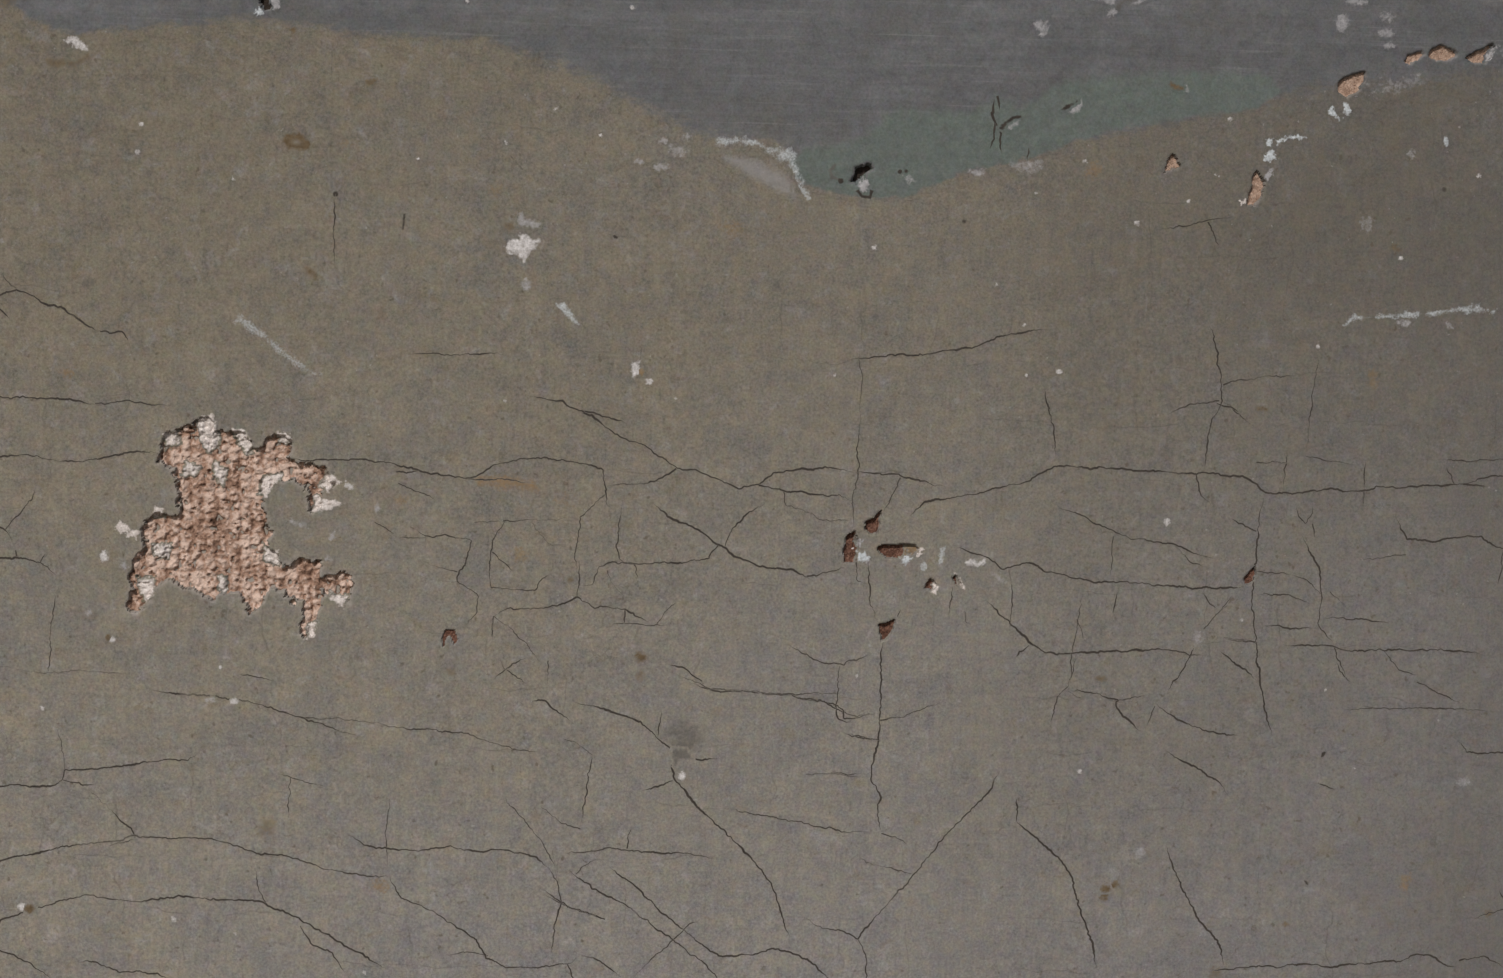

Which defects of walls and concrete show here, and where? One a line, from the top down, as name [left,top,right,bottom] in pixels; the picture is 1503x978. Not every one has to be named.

peeling [1404,44,1502,66]
peeling [1326,73,1364,123]
peeling [1236,130,1309,208]
crack [0,272,130,345]
spalling [111,411,353,642]
peeling [843,510,881,565]
peeling [925,571,968,596]
crack [0,322,1503,978]
peeling [878,619,894,639]